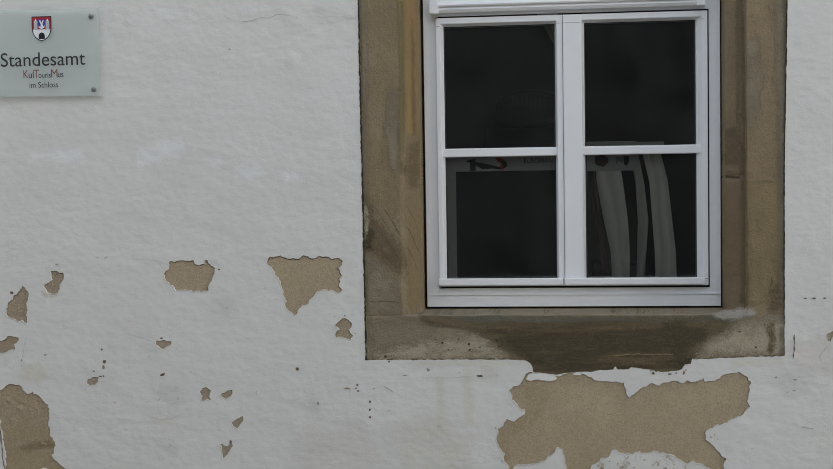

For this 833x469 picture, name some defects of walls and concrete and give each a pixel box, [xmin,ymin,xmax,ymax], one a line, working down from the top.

water stain [359,0,833,464]
peeling [43,264,64,295]
peeling [163,260,220,293]
peeling [266,255,343,316]
peeling [5,286,29,324]
peeling [0,336,19,354]
peeling [155,337,171,350]
peeling [333,315,356,341]
peeling [0,384,65,469]
peeling [495,370,751,469]